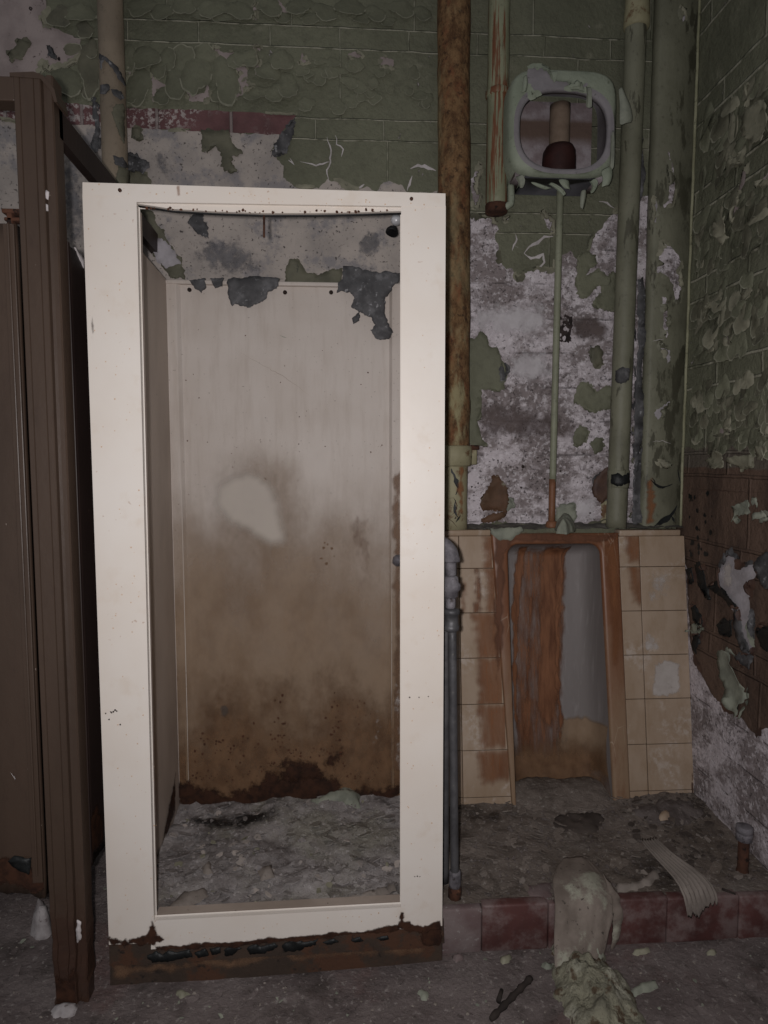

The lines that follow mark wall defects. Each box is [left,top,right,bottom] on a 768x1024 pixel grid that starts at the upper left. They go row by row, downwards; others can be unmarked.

peeling [0,111,20,227]
peeling [64,154,88,258]
peeling [62,53,406,192]
peeling [143,209,400,284]
peeling [727,145,768,224]
peeling [467,151,684,525]
corrosion [473,533,641,781]
peeling [685,547,768,871]
corrosion [108,912,442,966]